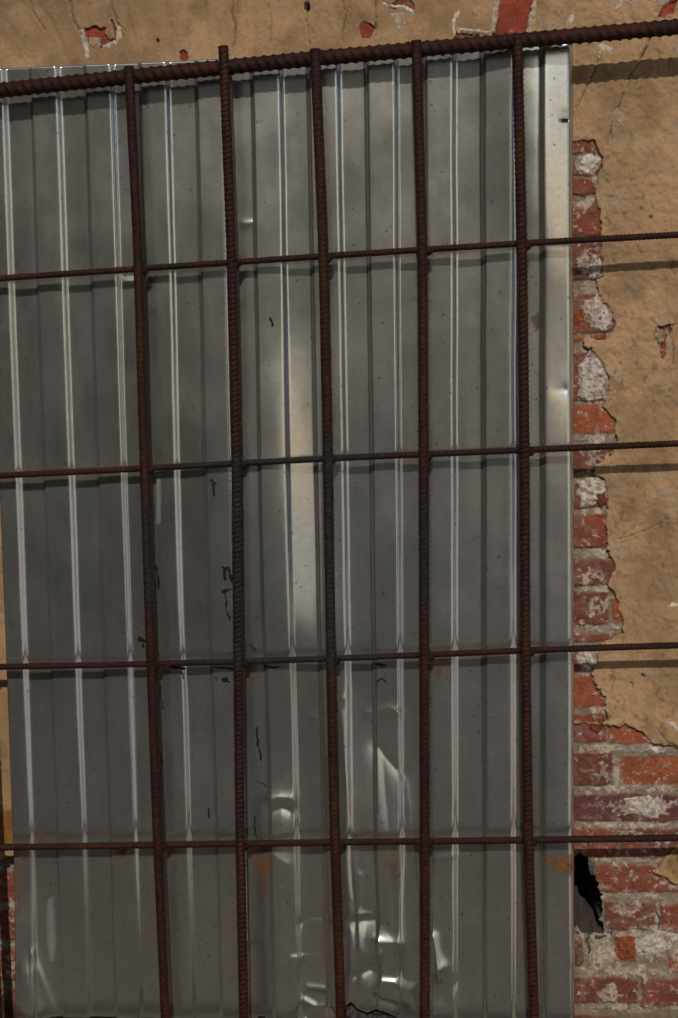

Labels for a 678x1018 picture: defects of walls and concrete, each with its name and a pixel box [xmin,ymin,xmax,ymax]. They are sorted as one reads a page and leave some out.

spalling [452,0,537,38]
spalling [614,0,678,19]
spalling [78,20,122,58]
spalling [573,140,678,1018]
spalling [0,857,22,1013]